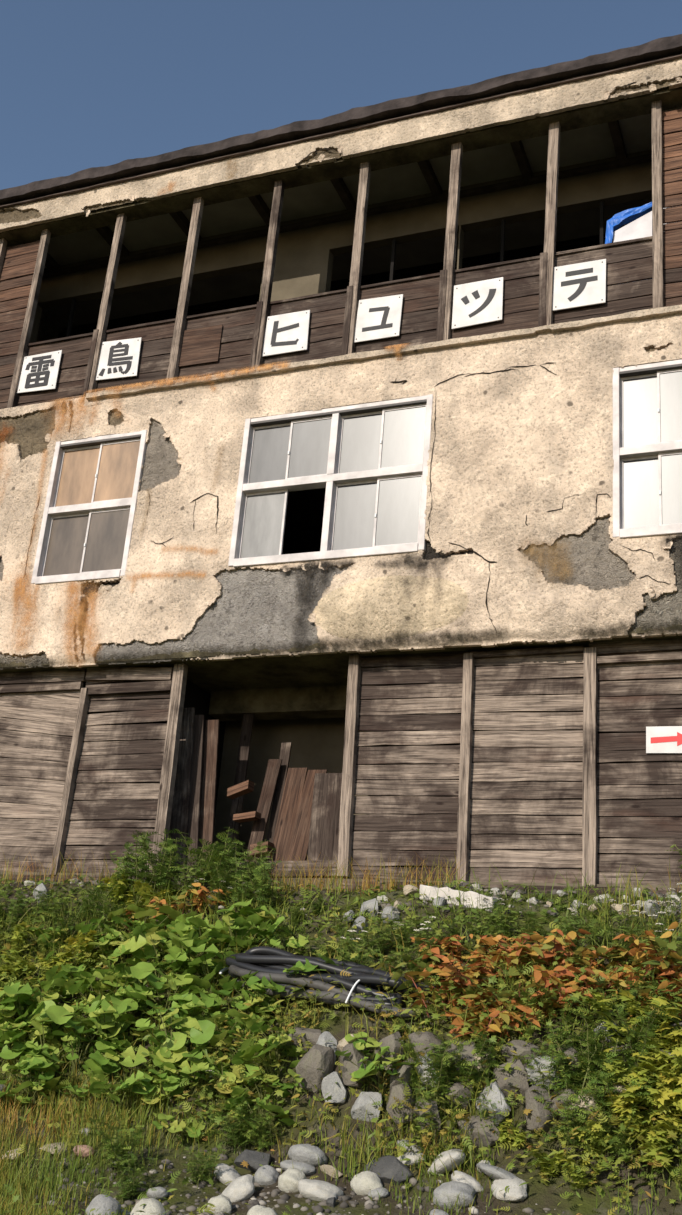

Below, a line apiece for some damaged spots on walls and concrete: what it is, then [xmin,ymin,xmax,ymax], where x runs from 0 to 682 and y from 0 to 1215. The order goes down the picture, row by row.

peeling [0,407,56,459]
peeling [139,420,184,492]
crack [427,362,556,633]
spalling [95,561,353,664]
spalling [519,515,636,591]
spalling [628,538,682,635]
spalling [0,652,51,669]